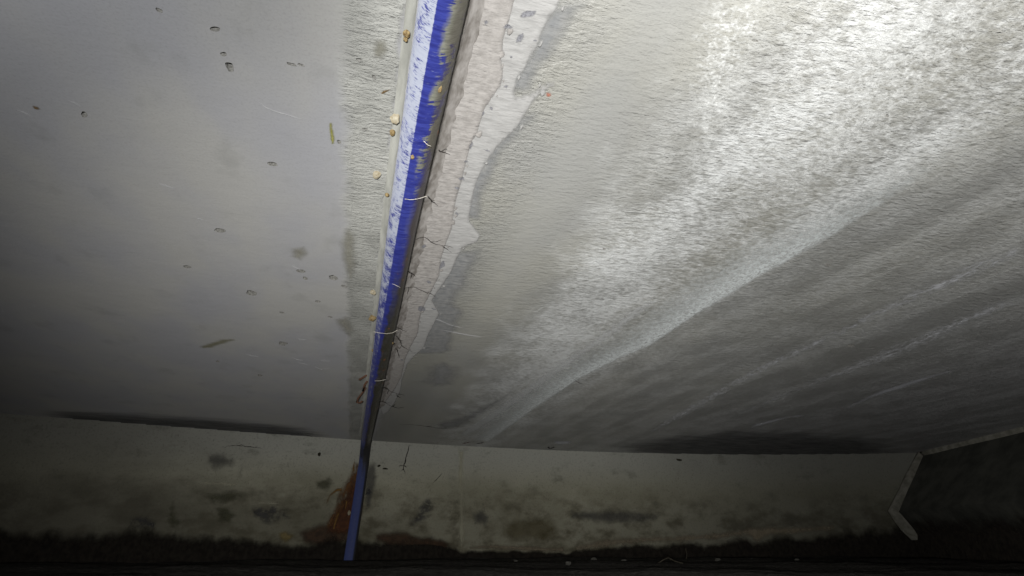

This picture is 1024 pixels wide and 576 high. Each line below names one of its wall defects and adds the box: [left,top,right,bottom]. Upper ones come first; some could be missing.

peeling [378,0,564,415]
rust [327,465,358,532]